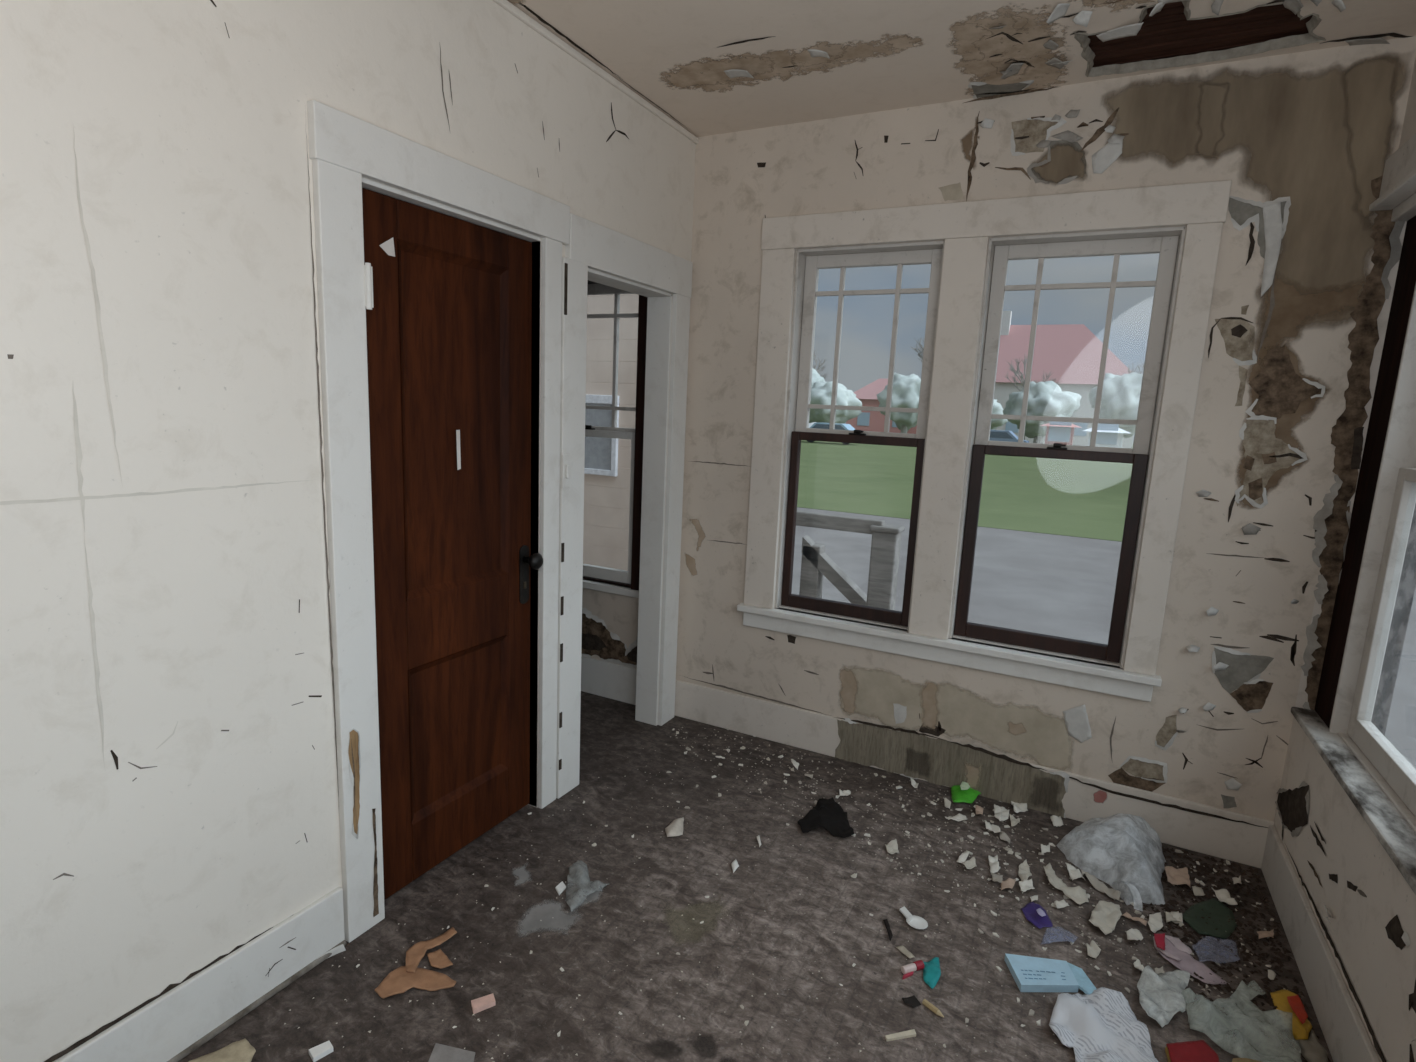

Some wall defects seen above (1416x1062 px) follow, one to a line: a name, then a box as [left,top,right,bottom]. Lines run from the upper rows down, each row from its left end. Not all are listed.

peeling [661,34,923,92]
flaking render [949,0,1346,99]
peeling [977,107,1129,184]
flaking render [1108,175,1405,792]
peeling [835,668,1092,818]
flaking render [1275,781,1367,897]
crack [44,916,291,1062]
peeling [1385,915,1411,950]